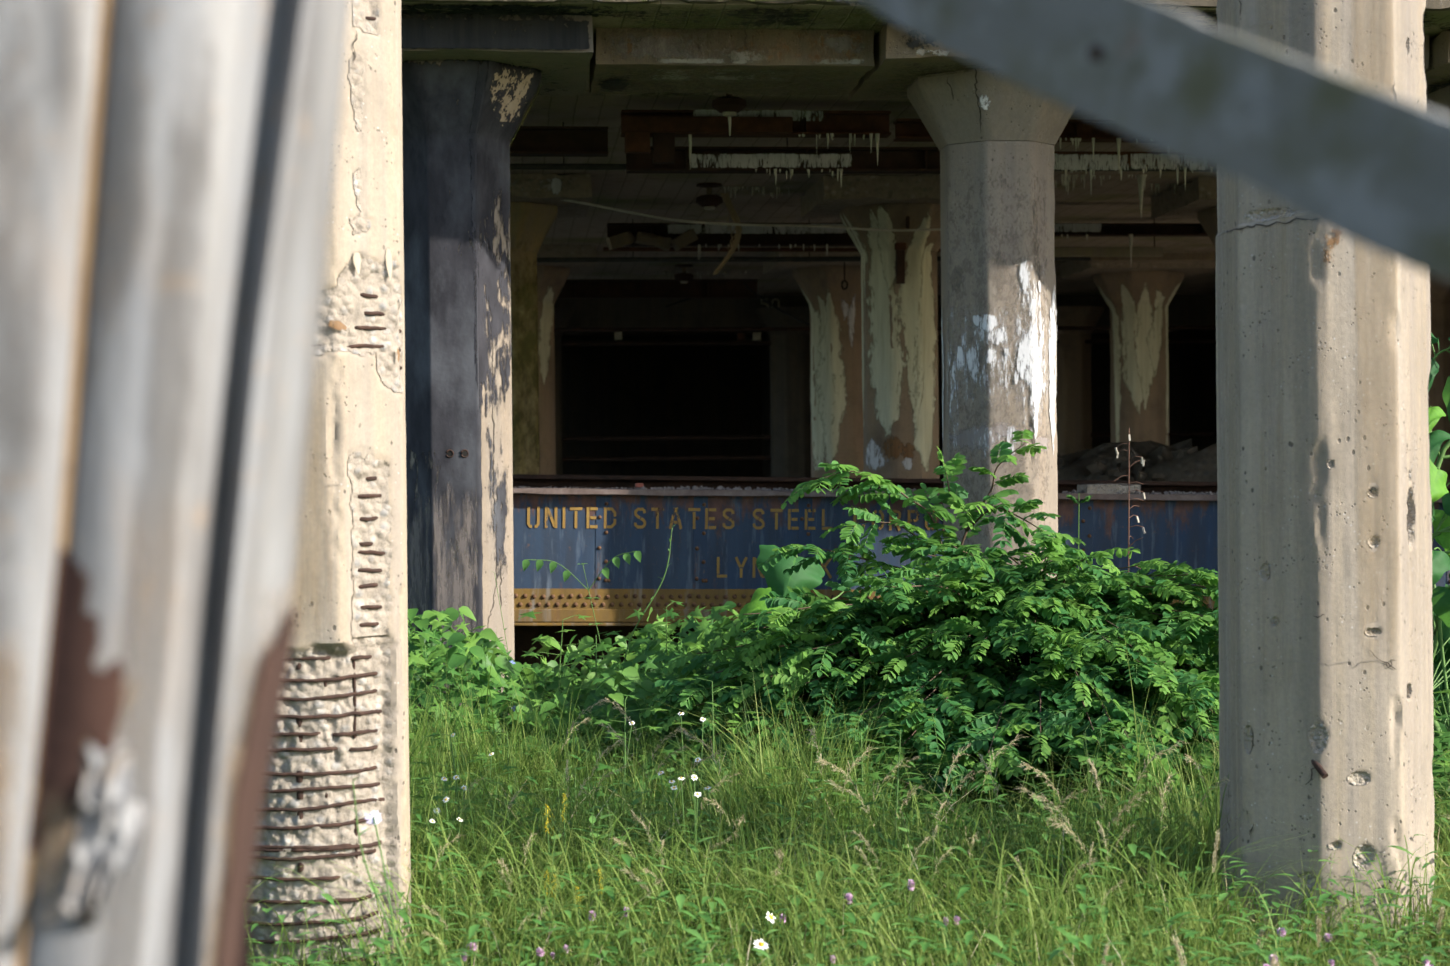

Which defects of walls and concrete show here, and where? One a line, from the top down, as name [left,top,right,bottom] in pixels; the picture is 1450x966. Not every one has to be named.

water stain [689,153,852,168]
crack [1222,218,1313,234]
peeling [249,0,647,966]
spalling [1308,722,1329,753]
spalling [1348,771,1371,785]
spalling [1328,842,1376,870]